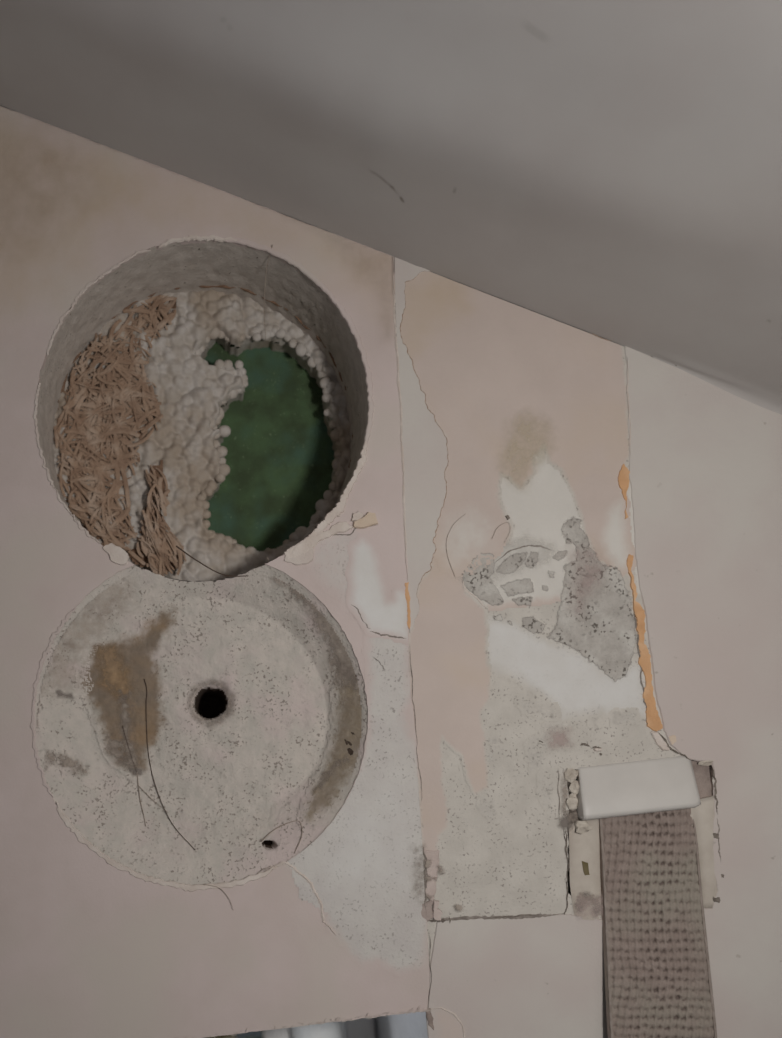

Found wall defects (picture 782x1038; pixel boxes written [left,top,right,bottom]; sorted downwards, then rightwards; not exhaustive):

crack [393,262,408,581]
peeling [618,464,630,519]
water stain [37,573,182,781]
peeling [258,582,443,978]
flaking render [462,517,677,745]